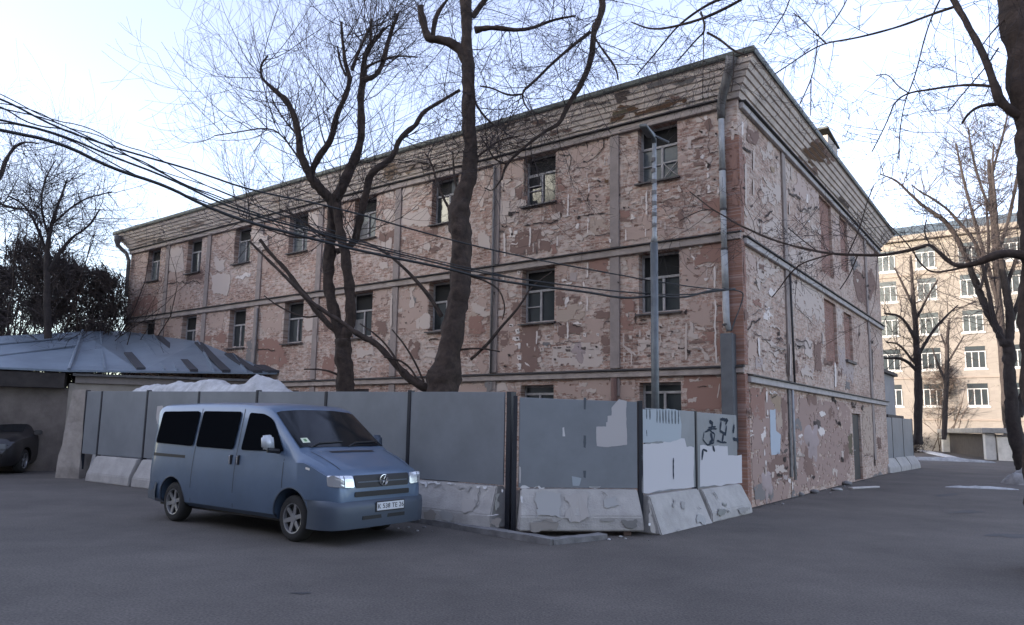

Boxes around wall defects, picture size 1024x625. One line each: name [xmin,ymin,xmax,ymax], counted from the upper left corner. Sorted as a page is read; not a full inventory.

spalling [551,144,593,219]
flaking render [594,167,632,223]
spalling [741,126,759,207]
spalling [551,322,610,367]
spalling [767,398,789,484]
spalling [803,446,815,480]